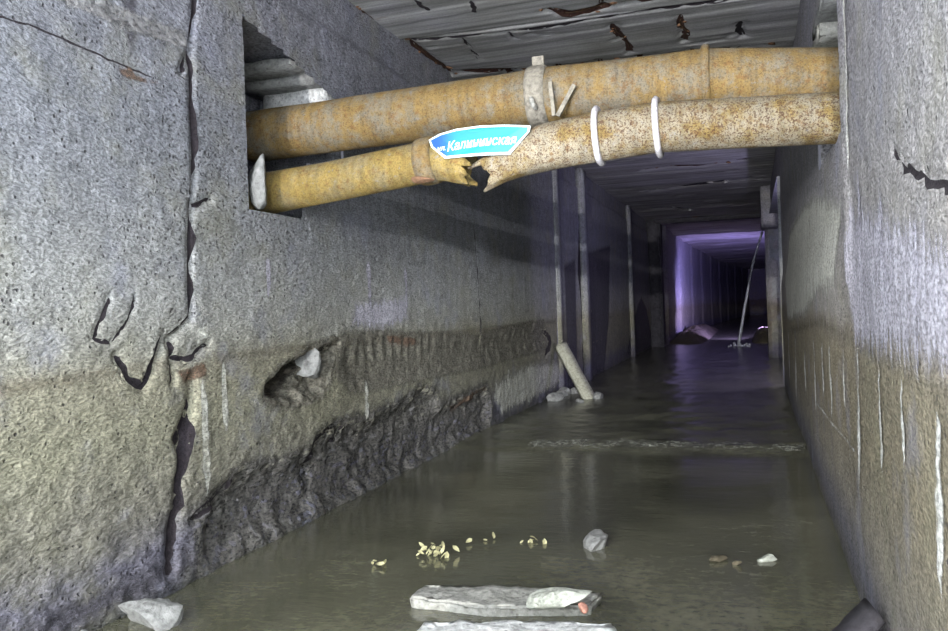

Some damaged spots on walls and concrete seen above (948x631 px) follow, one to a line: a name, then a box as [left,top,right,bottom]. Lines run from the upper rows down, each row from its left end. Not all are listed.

crack [0,14,152,79]
crack [405,0,775,75]
corrosion [411,176,435,184]
crack [645,158,751,217]
crack [893,143,948,201]
crack [90,0,232,575]
crack [576,229,584,374]
crack [541,329,551,356]
crack [300,421,343,477]
spalling [191,319,550,578]